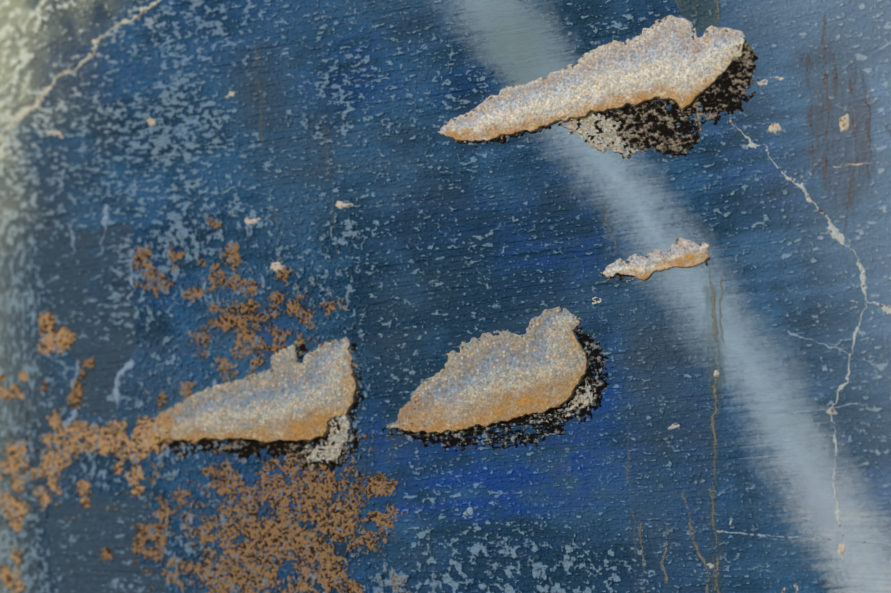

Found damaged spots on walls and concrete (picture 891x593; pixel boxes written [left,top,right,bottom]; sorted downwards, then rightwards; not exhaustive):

crack [0,0,160,154]
spalling [438,15,759,160]
peeling [204,212,231,232]
spalling [0,240,614,593]
crack [716,120,891,570]